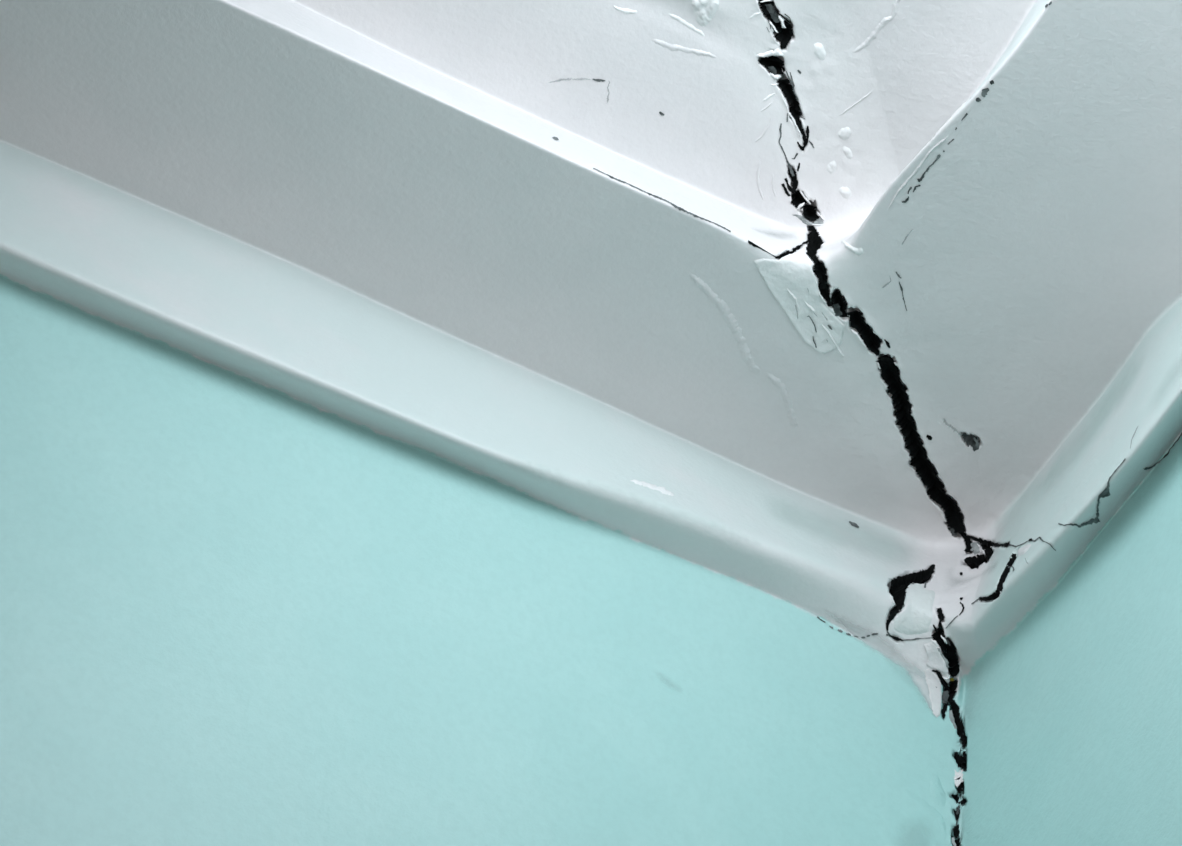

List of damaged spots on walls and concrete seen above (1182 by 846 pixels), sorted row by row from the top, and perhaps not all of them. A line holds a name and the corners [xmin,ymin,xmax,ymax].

peeling [753,245,845,357]
crack [593,0,1182,846]